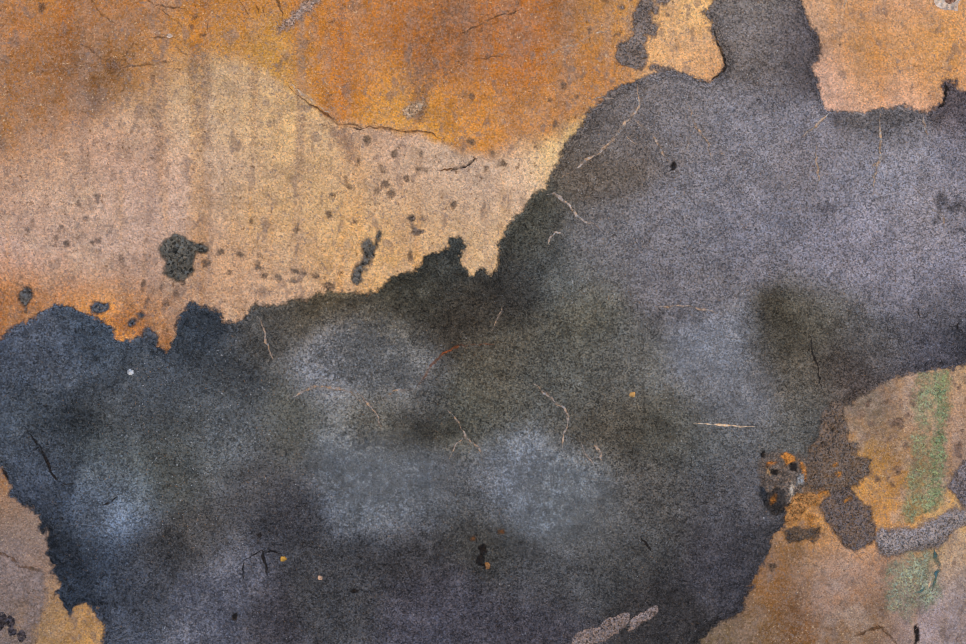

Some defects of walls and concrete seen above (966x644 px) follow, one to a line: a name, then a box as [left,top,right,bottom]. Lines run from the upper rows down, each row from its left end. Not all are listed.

crack [290,84,446,145]
damp [832,85,966,139]
crack [439,158,475,171]
damp [934,194,964,223]
damp [743,294,966,424]
damp [106,191,772,644]
damp [0,311,144,608]